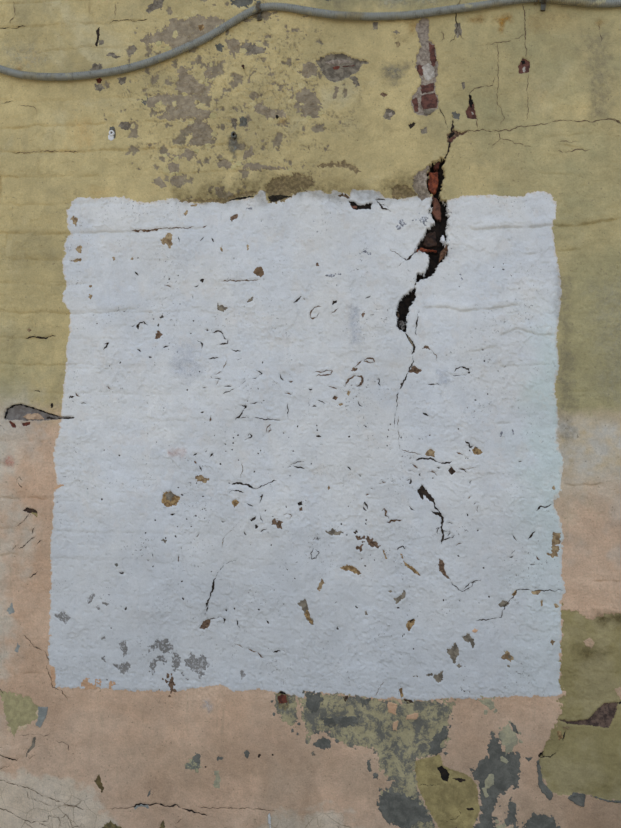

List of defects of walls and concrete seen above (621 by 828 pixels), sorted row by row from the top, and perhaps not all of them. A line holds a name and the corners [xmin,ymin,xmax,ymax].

peeling [90,10,225,91]
peeling [140,62,217,188]
spalling [231,53,369,130]
spalling [409,18,439,134]
spalling [179,146,361,216]
spalling [4,403,74,428]
crack [314,357,475,470]
crack [432,505,454,544]
peeling [298,599,314,625]
peeling [271,603,621,828]
crack [0,747,83,828]
crack [113,790,274,828]